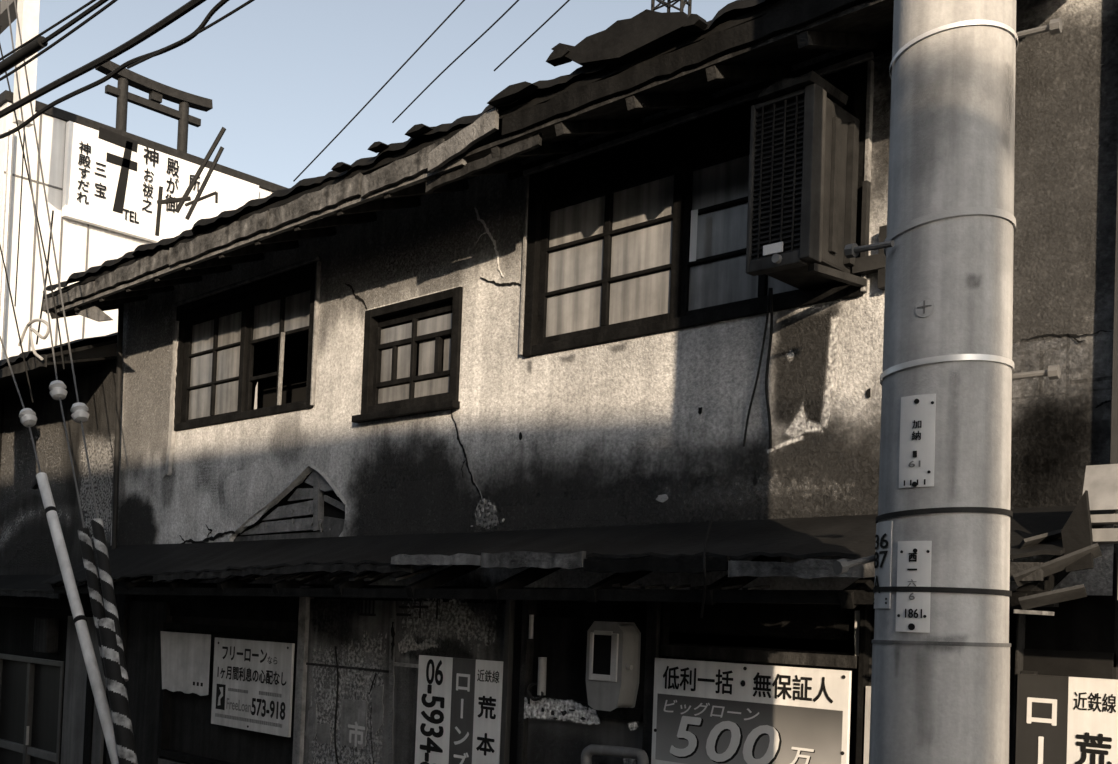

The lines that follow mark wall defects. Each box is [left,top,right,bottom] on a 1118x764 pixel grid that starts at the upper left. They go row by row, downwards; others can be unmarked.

crack [474,207,521,286]
crack [451,410,482,499]
leakage [346,303,881,536]
leakage [1010,395,1111,508]
spalling [471,499,505,529]
peeling [524,698,600,724]